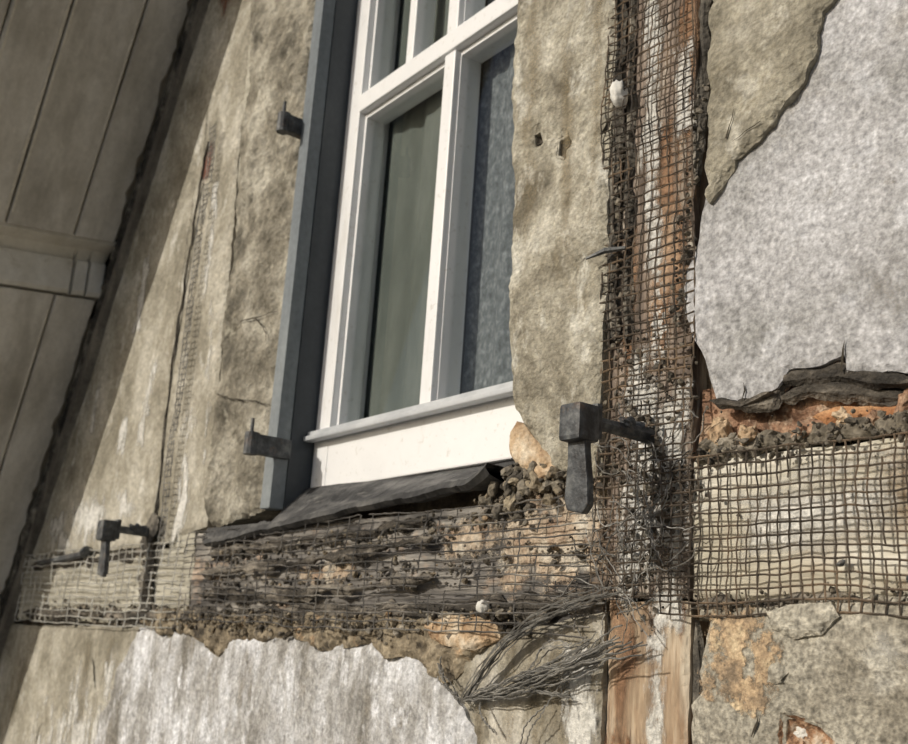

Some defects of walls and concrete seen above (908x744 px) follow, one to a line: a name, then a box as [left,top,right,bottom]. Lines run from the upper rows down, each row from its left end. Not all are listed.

rust [679,0,698,115]
crack [725,109,760,141]
peeling [203,181,219,295]
rust [648,121,691,356]
flaking render [685,0,908,452]
peeling [50,492,105,554]
peeling [117,362,157,455]
peeling [171,454,188,544]
flaking render [509,421,565,481]
rust [614,610,637,717]
flaking render [699,601,841,718]
flaking render [777,715,835,744]